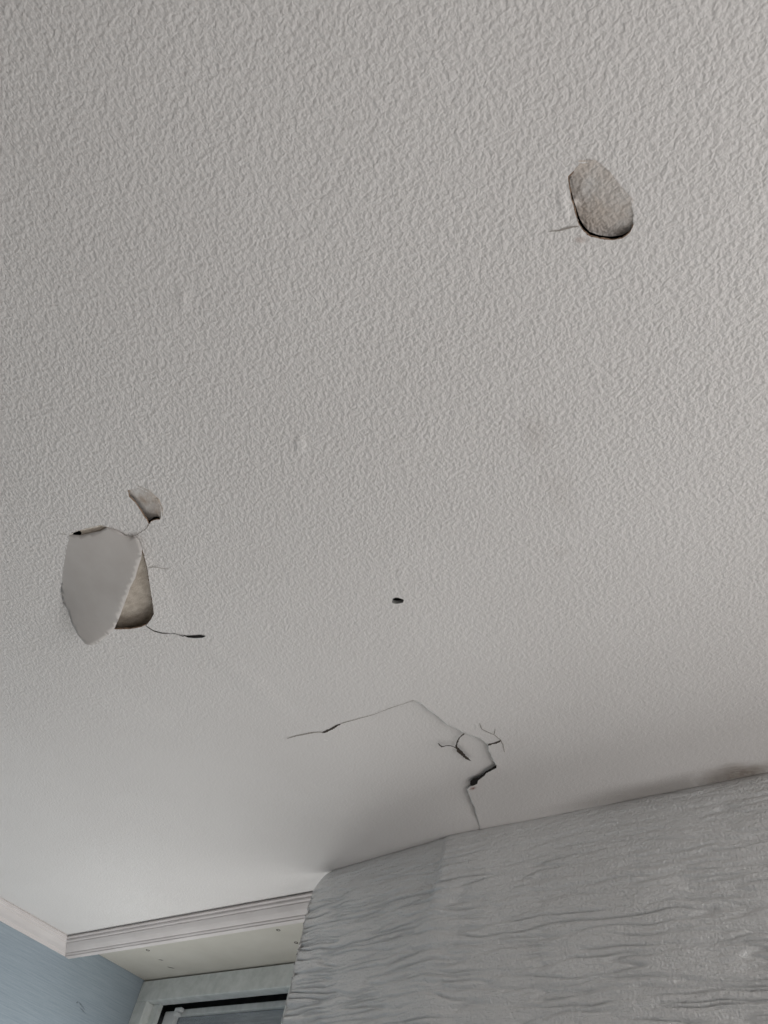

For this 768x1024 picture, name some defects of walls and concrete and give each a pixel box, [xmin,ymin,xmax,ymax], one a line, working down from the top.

peeling [61,525,205,645]
crack [287,700,505,868]